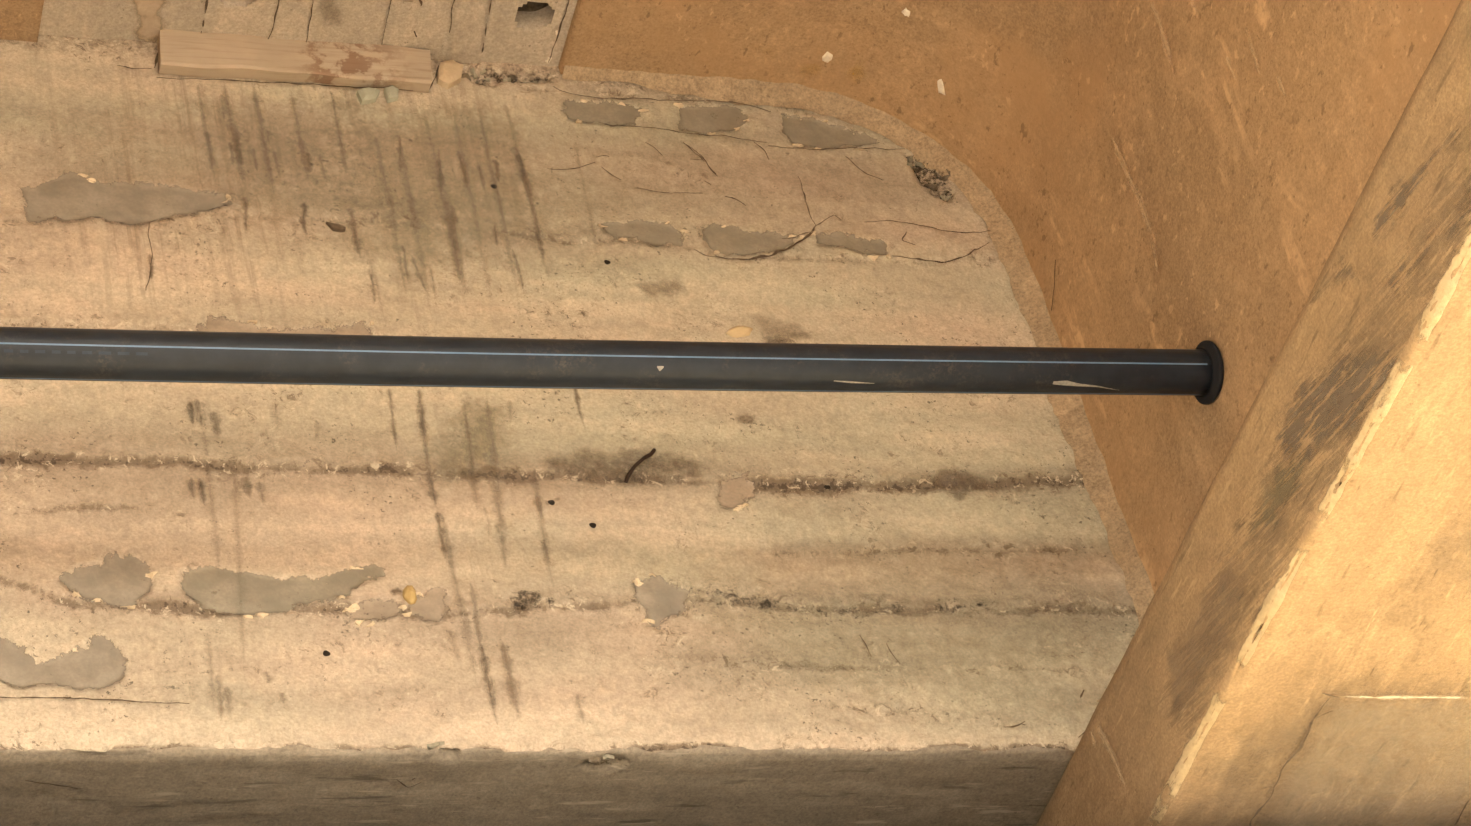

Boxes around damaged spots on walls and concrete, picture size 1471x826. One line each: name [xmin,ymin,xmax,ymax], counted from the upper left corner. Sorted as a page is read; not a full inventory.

peeling [561,99,649,127]
crack [547,0,990,263]
peeling [781,113,879,150]
peeling [21,171,232,225]
spalling [907,156,952,202]
peeling [598,219,891,261]
leakage [1251,353,1396,530]
peeling [716,471,755,512]
peeling [59,551,158,609]
peeling [181,564,450,627]
peeling [632,573,690,629]
peeling [0,635,129,690]